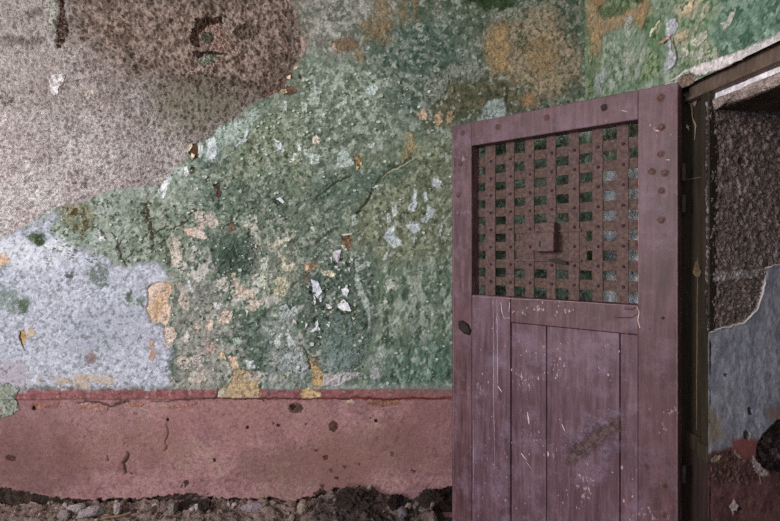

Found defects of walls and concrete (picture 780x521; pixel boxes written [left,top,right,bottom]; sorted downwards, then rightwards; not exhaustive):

spalling [0,0,484,417]
crack [310,175,352,205]
crack [355,157,412,215]
spalling [649,0,780,333]
spalling [708,450,769,485]